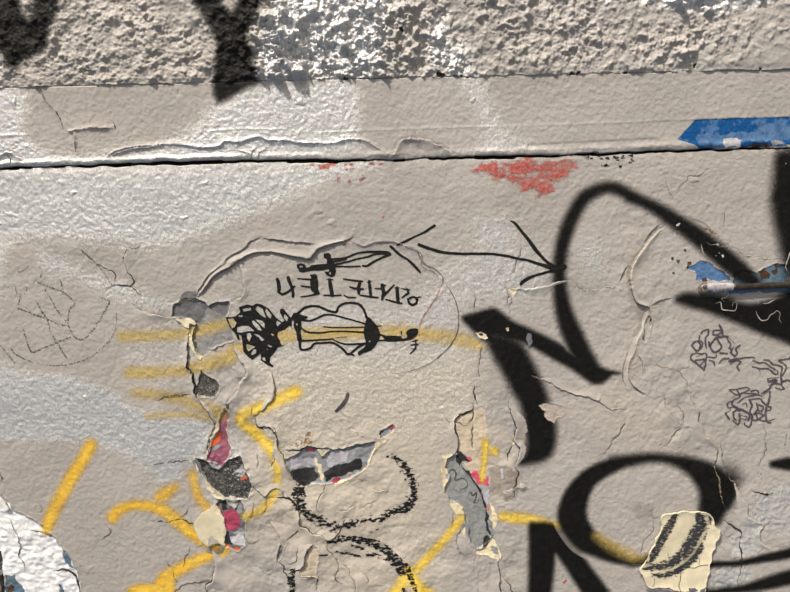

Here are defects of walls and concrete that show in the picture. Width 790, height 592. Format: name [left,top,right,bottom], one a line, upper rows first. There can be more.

peeling [678,117,790,149]
peeling [172,291,233,360]
crack [507,280,614,309]
peeling [686,243,790,295]
peeling [191,404,252,551]
crack [83,243,366,592]
crack [446,348,482,454]
peeling [455,406,489,478]
crack [505,395,528,502]
crack [537,377,625,446]
crack [659,396,778,590]
peeling [0,495,80,592]